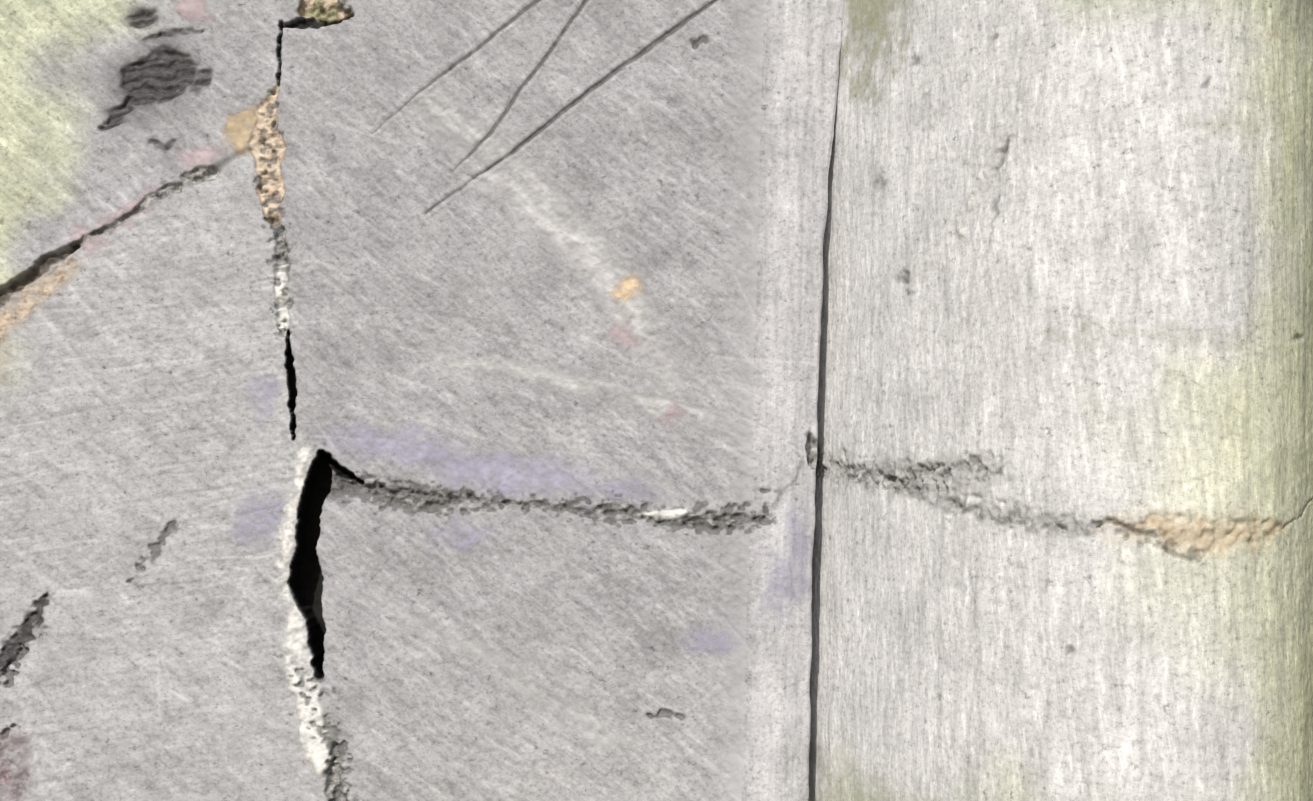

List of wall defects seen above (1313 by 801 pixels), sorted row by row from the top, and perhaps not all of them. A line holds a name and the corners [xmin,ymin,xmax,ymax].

spalling [284,0,354,29]
spalling [100,10,211,130]
crack [0,166,220,337]
crack [248,23,776,801]
crack [816,460,1026,525]
crack [1059,518,1139,532]
spalling [0,593,48,687]